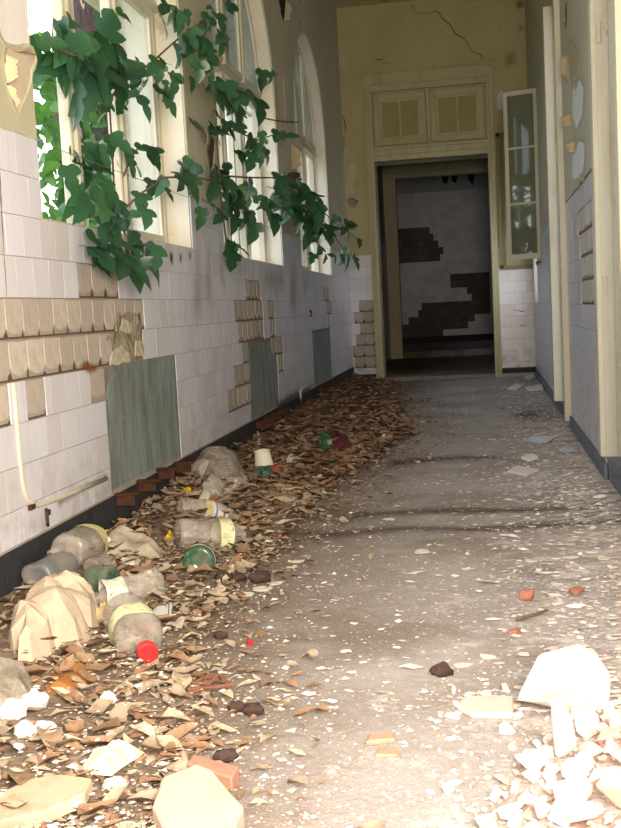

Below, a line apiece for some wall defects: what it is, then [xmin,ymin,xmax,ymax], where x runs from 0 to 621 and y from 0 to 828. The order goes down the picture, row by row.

peeling [0,0,37,120]
peeling [284,0,292,21]
crack [411,4,495,61]
peeling [559,31,586,189]
flaking render [0,263,144,428]